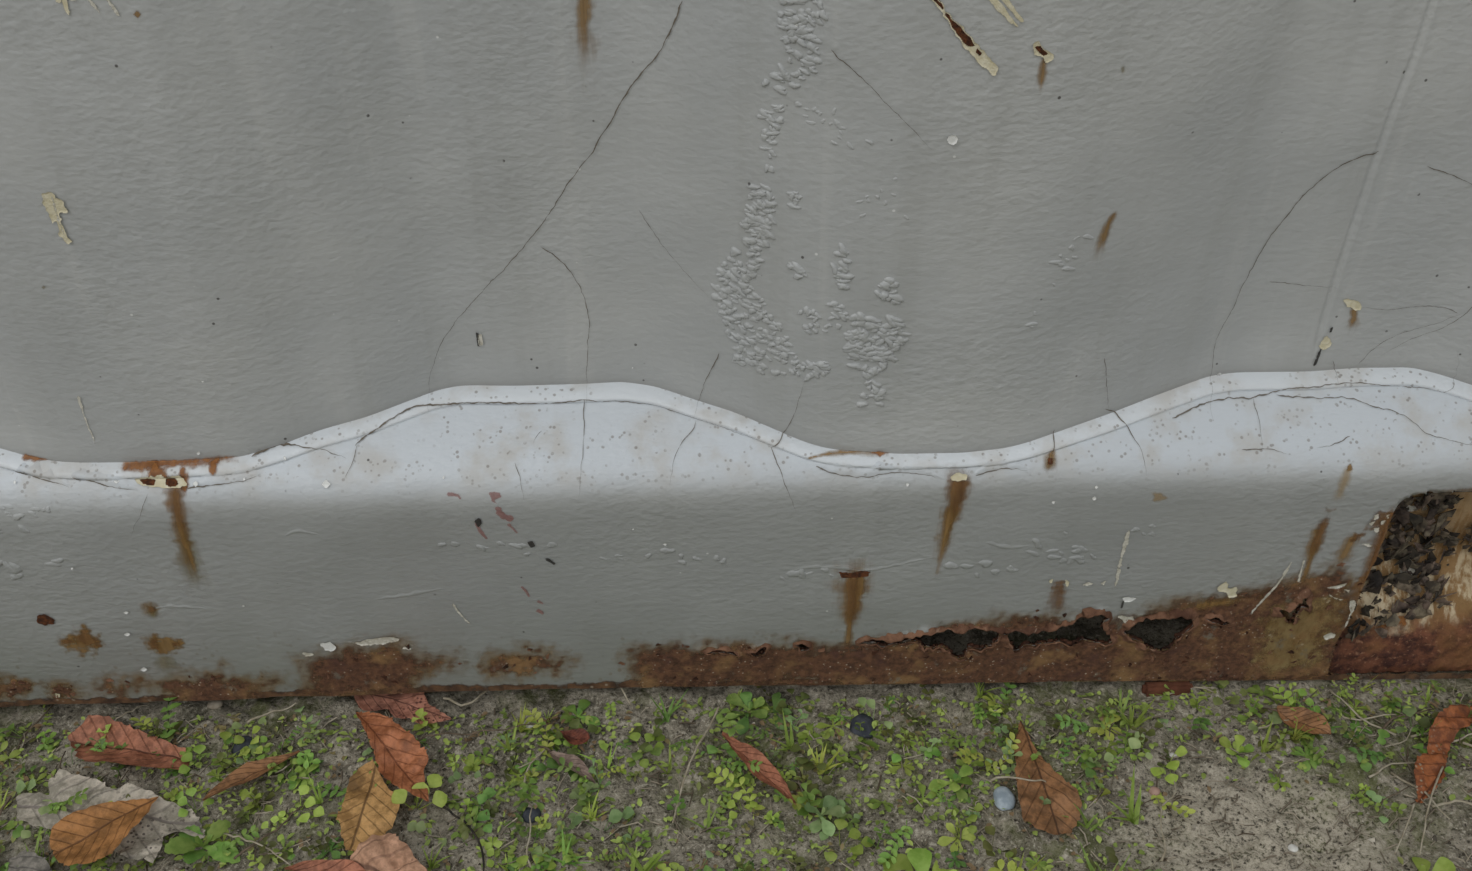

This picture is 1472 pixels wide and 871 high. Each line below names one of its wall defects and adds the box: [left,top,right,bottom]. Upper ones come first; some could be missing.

spalling [932,0,999,76]
peeling [41,192,72,244]
crack [252,2,734,496]
crack [771,391,802,502]
rust [123,457,232,568]
rust [941,473,967,553]
peeling [1355,512,1389,547]
rust [0,492,1472,707]
peeling [1324,575,1368,640]